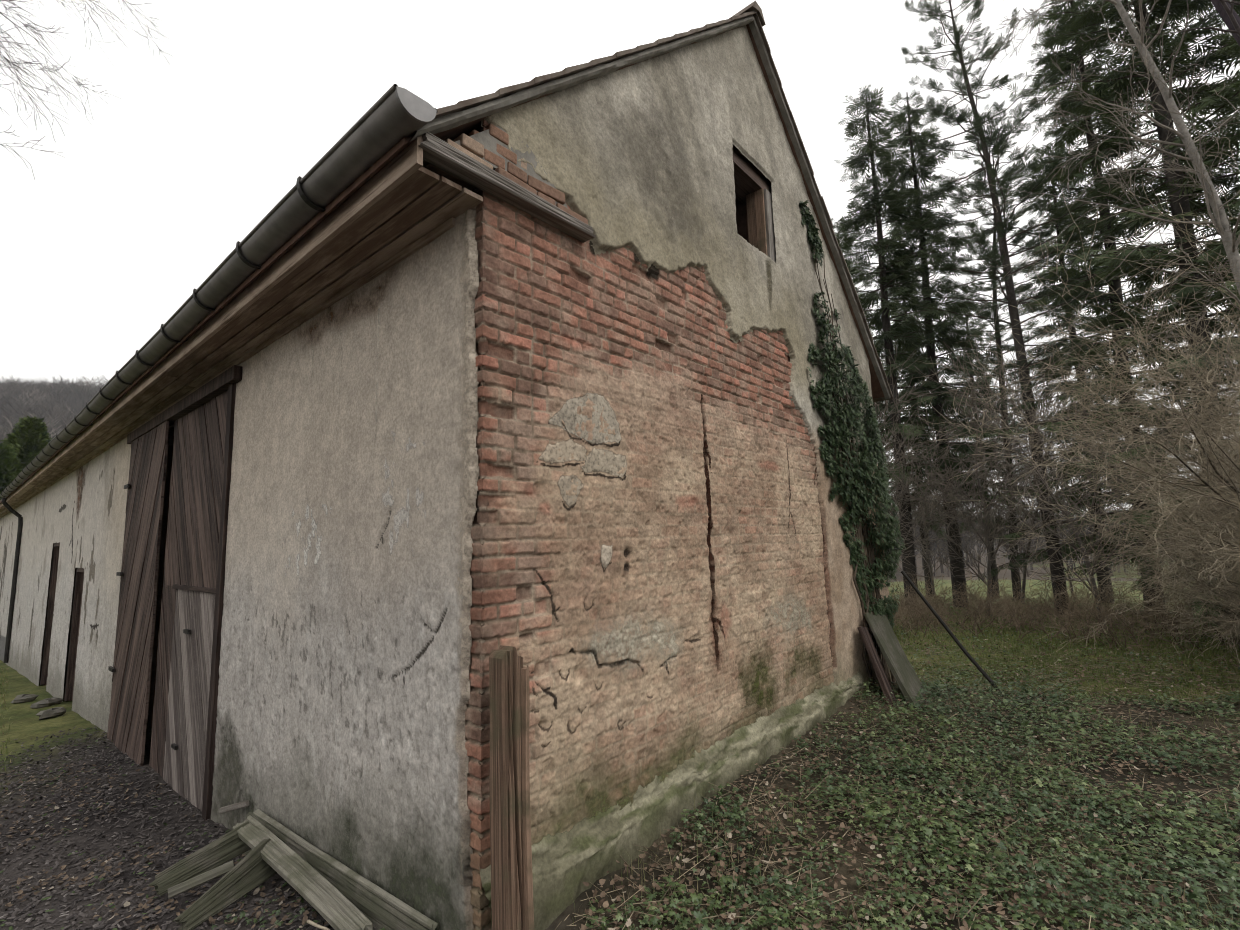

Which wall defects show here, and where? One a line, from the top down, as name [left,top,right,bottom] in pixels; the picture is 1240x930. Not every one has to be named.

crack [394,609,447,684]
crack [527,431,725,748]
flaking render [456,191,834,930]